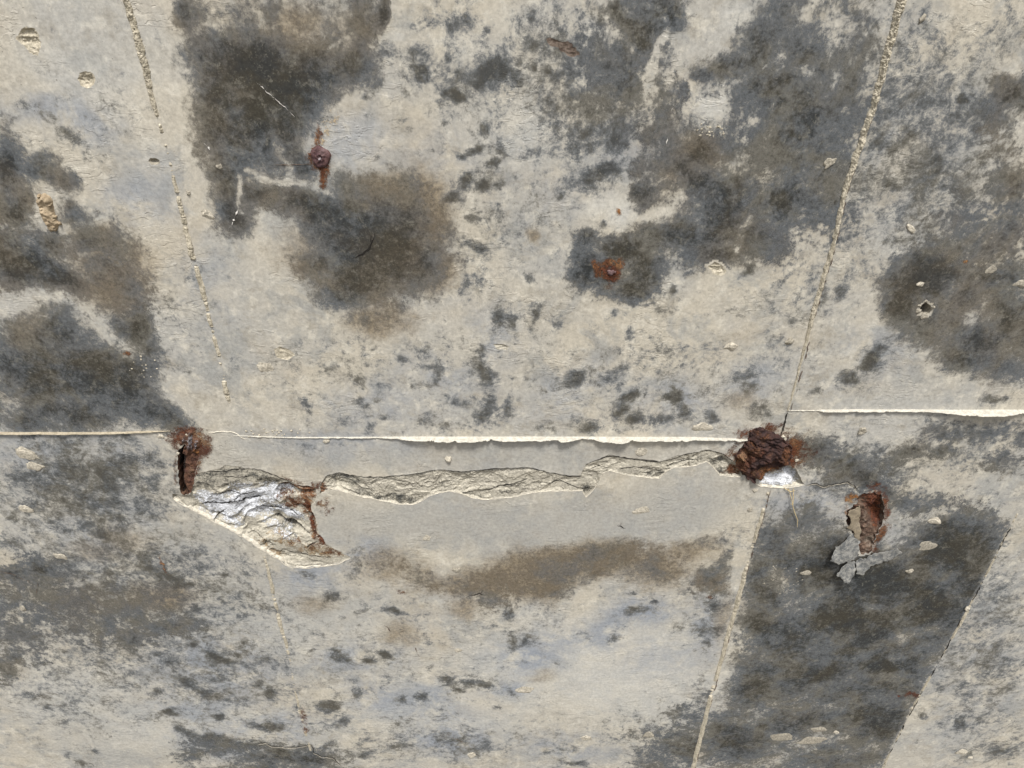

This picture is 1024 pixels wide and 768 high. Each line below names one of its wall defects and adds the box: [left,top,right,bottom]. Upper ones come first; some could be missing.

water stain [0,113,198,439]
corrosion [308,128,330,189]
water stain [172,0,467,327]
corrosion [591,258,625,289]
water stain [564,0,884,306]
water stain [875,70,1024,386]
spalling [157,425,743,569]
water stain [375,535,733,613]
corrosion [725,423,818,484]
water stain [618,420,1024,768]
spalling [755,464,902,584]